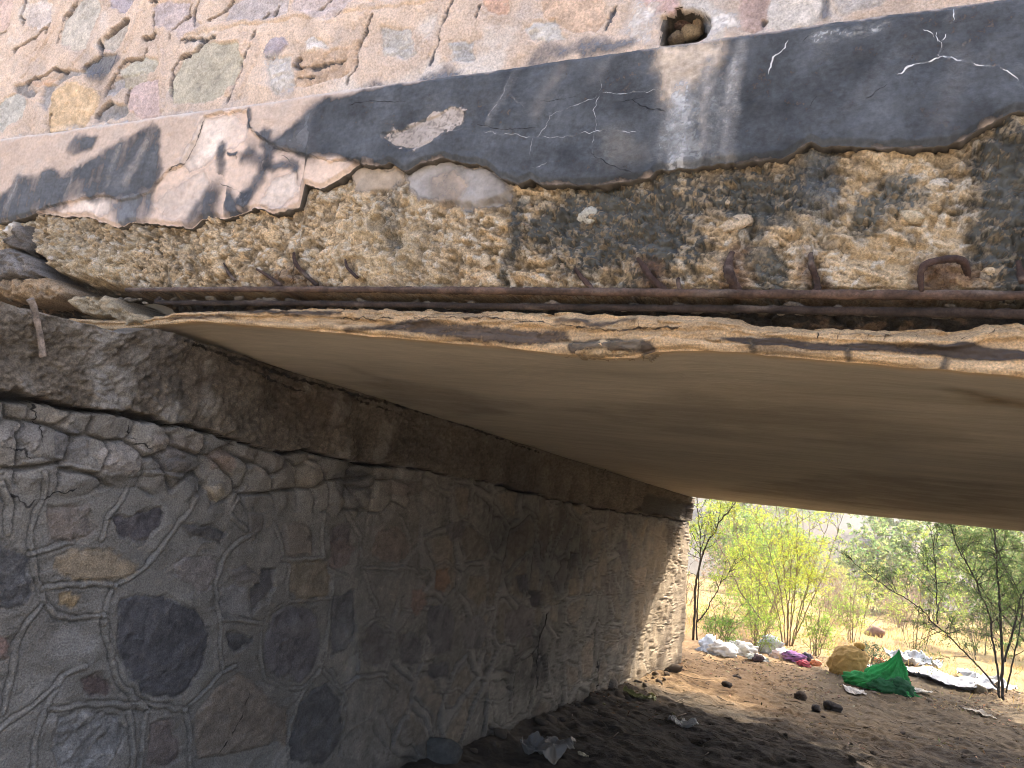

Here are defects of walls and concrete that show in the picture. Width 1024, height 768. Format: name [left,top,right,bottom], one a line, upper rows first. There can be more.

crack [867,11,1018,98]
crack [477,84,664,173]
spalling [0,107,1024,332]
corrosion [169,310,343,319]
crack [6,401,43,459]